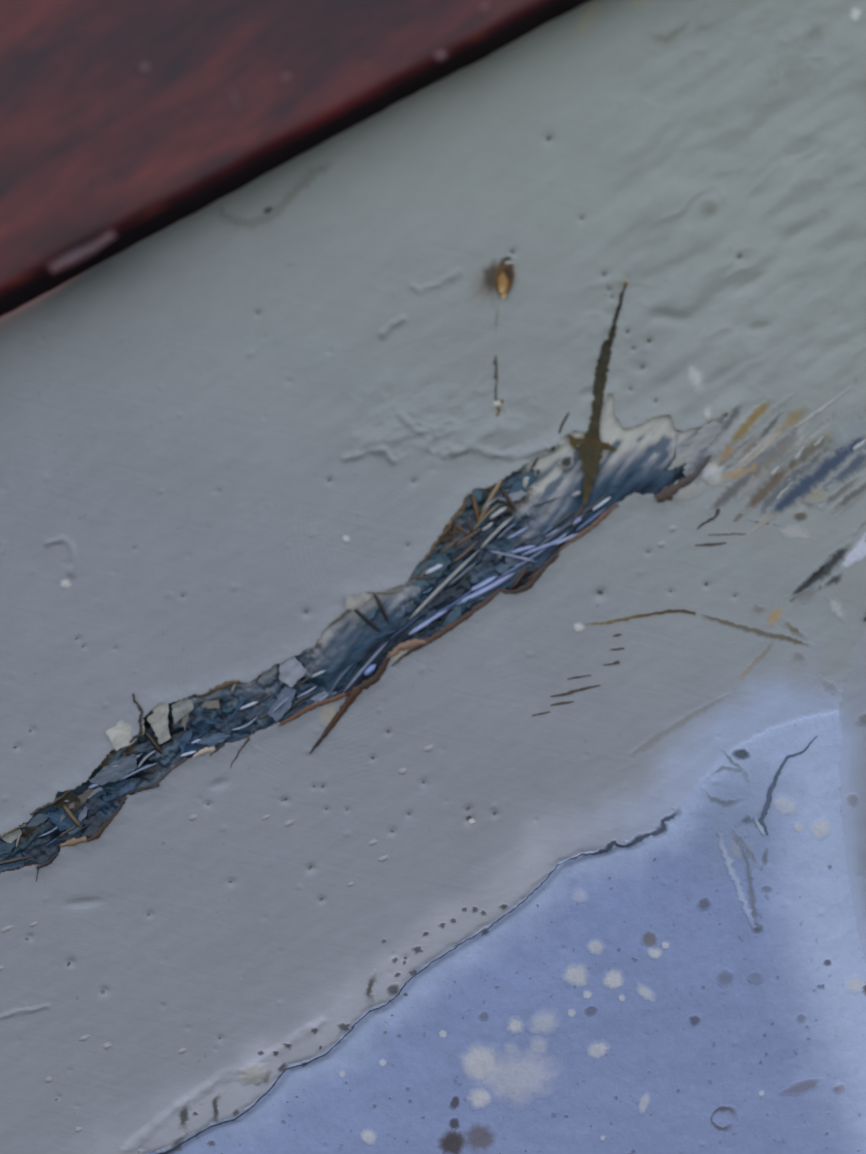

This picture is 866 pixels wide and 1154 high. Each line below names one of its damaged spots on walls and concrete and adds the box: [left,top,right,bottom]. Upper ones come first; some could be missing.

corrosion [480,255,500,338]
corrosion [492,356,504,417]
peeling [0,394,729,882]
peeling [699,764,766,928]
crack [718,736,817,870]